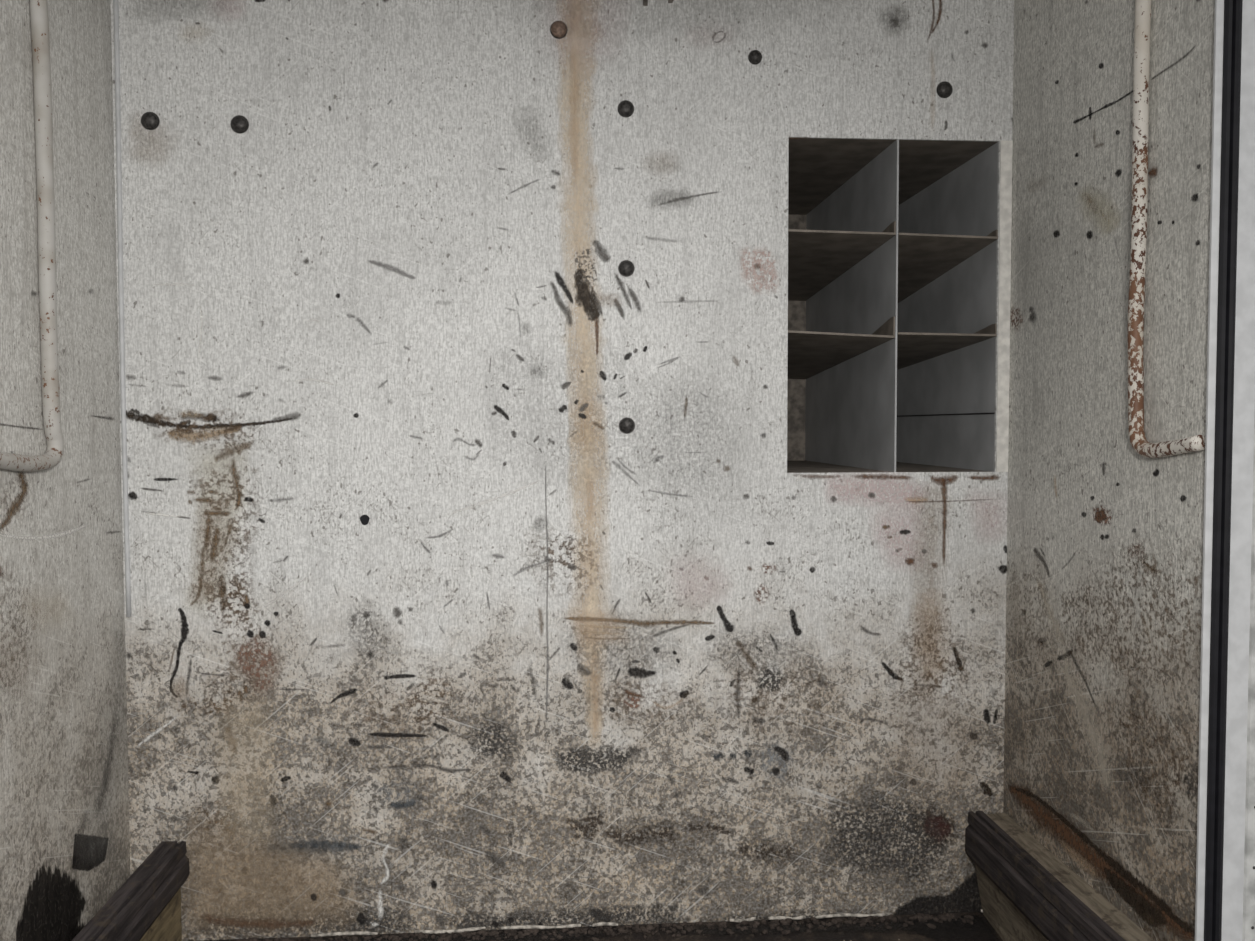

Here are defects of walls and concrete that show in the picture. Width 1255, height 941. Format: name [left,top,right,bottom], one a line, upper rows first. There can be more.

rust [908,476,957,560]
rust [171,414,278,713]
water stain [717,606,755,713]
water stain [882,662,903,681]
rust [909,628,961,698]
water stain [349,723,448,746]
water stain [413,763,470,772]
water stain [606,824,731,845]
water stain [268,841,359,853]
water stain [740,843,794,860]
water stain [198,905,919,941]